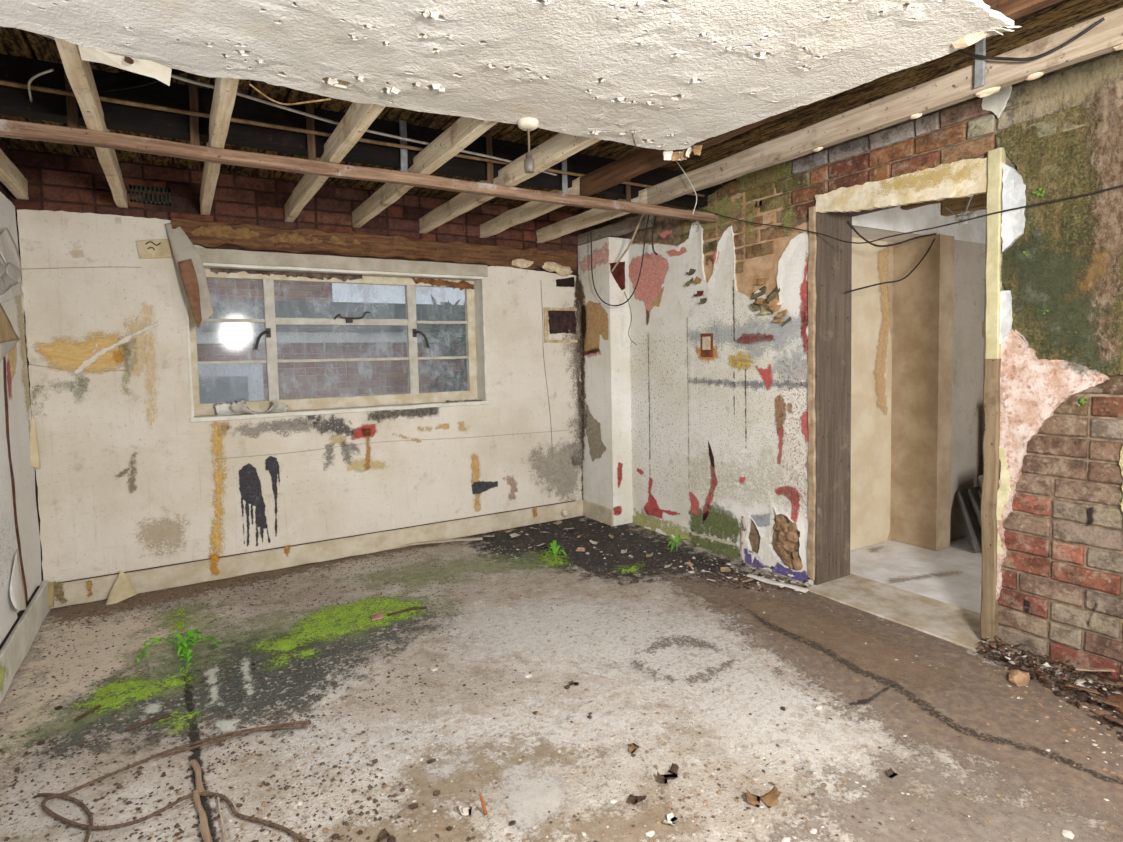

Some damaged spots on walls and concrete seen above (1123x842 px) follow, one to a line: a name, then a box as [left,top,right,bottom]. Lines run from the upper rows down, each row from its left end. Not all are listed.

peeling [322,76,365,86]
peeling [381,82,446,95]
peeling [190,224,361,246]
peeling [556,243,609,287]
flaking render [581,301,608,355]
flaking render [613,51,1123,585]
water stain [1014,51,1123,364]
rust [209,421,229,575]
flaking render [585,404,606,460]
flaking render [996,329,1123,682]
water stain [0,600,449,775]
crack [739,603,1123,784]